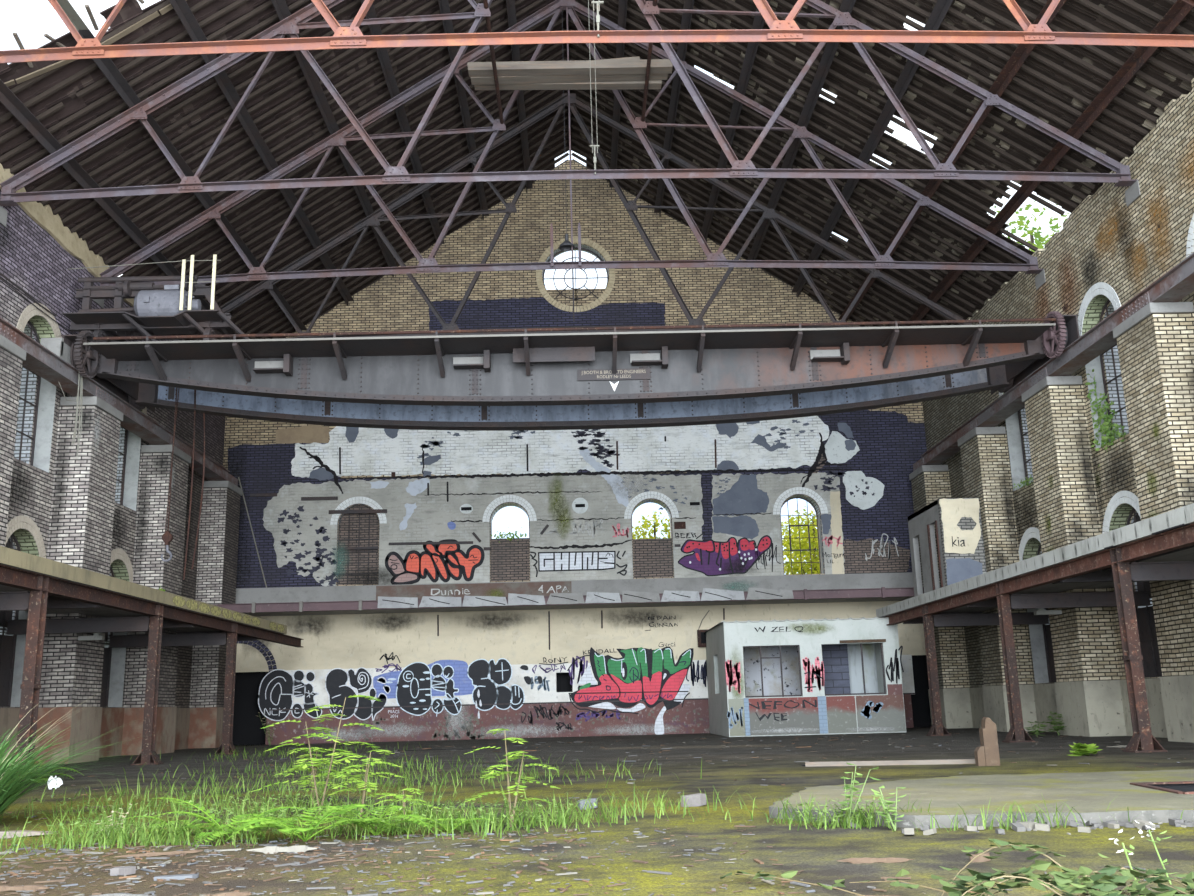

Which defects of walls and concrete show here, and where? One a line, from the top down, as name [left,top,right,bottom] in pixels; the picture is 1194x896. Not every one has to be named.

peeling [345,427,359,442]
peeling [384,429,399,439]
peeling [417,432,461,477]
peeling [571,429,620,468]
peeling [716,420,814,452]
peeling [845,439,856,451]
crack [300,433,860,549]
peeling [621,476,687,513]
peeling [813,453,874,497]